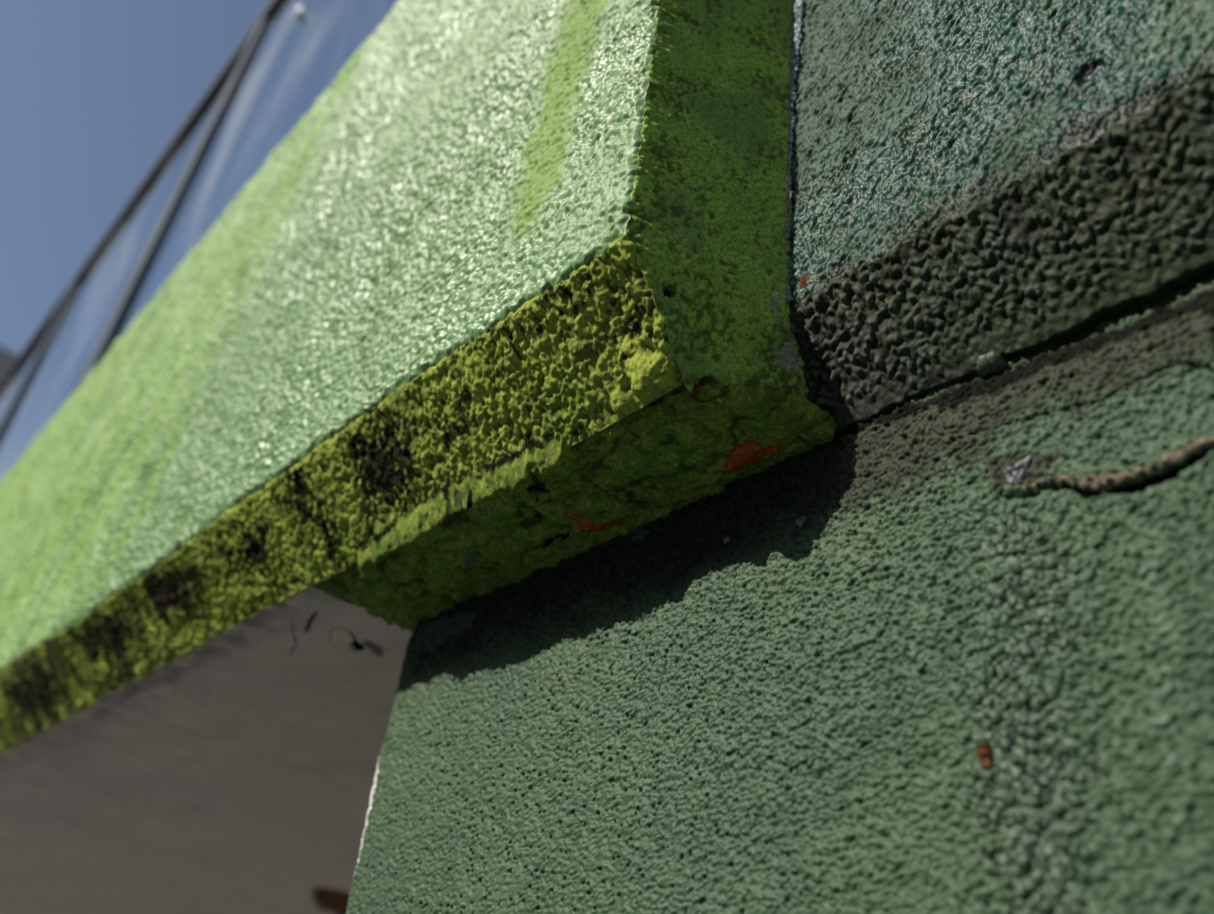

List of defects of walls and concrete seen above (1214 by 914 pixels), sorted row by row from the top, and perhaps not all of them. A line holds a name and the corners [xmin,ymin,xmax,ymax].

water stain [486,248,669,365]
water stain [4,142,494,671]
crack [992,437,1214,499]
water stain [401,451,828,694]
water stain [1,660,117,792]